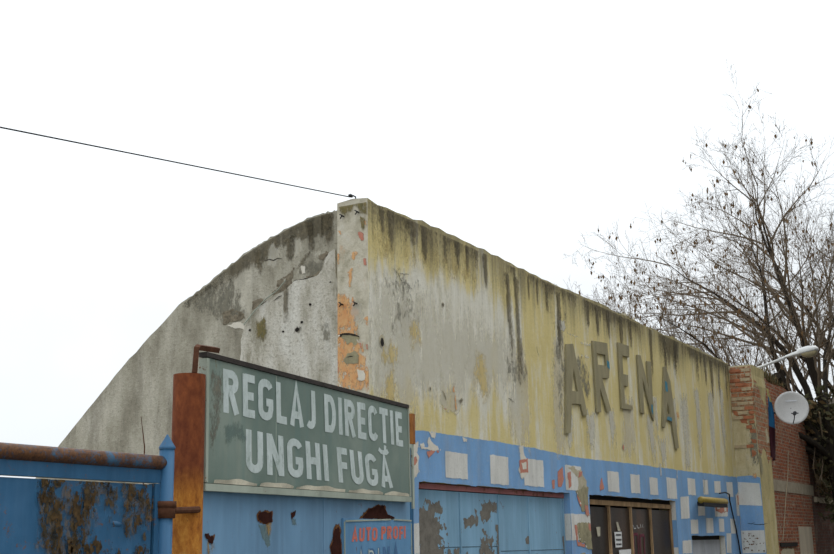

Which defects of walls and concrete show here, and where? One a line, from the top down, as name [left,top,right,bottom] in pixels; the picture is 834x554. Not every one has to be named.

water stain [183,202,367,320]
flaking render [272,251,339,295]
water stain [377,206,432,260]
water stain [443,235,488,285]
peeling [337,251,369,391]
water stain [504,266,527,380]
water stain [527,275,728,414]
flaking render [673,366,771,475]
rust [37,479,154,554]
peeling [419,498,468,554]
peeling [463,499,499,554]
flaking render [552,466,593,554]